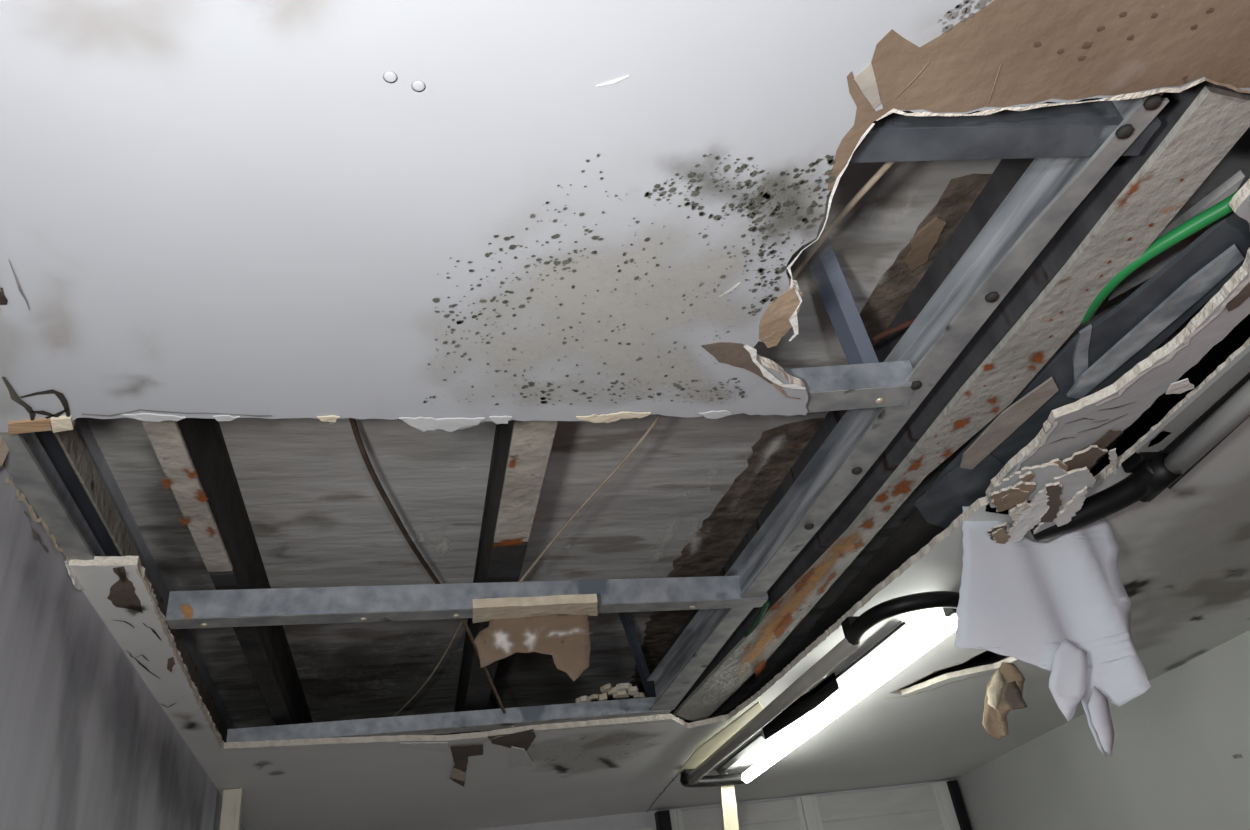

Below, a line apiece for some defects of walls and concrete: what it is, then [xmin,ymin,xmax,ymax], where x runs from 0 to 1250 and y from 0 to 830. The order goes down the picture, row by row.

peeling [701,0,1250,399]
mould [427,154,835,405]
corrosion [1029,311,1063,370]
peeling [81,409,272,422]
peeling [399,416,512,432]
peeling [576,412,651,423]
corrosion [983,363,1015,412]
spalling [666,418,825,578]
peeling [987,429,1123,544]
corrosion [743,418,969,675]
spalling [107,566,145,614]
leakage [1124,581,1147,597]